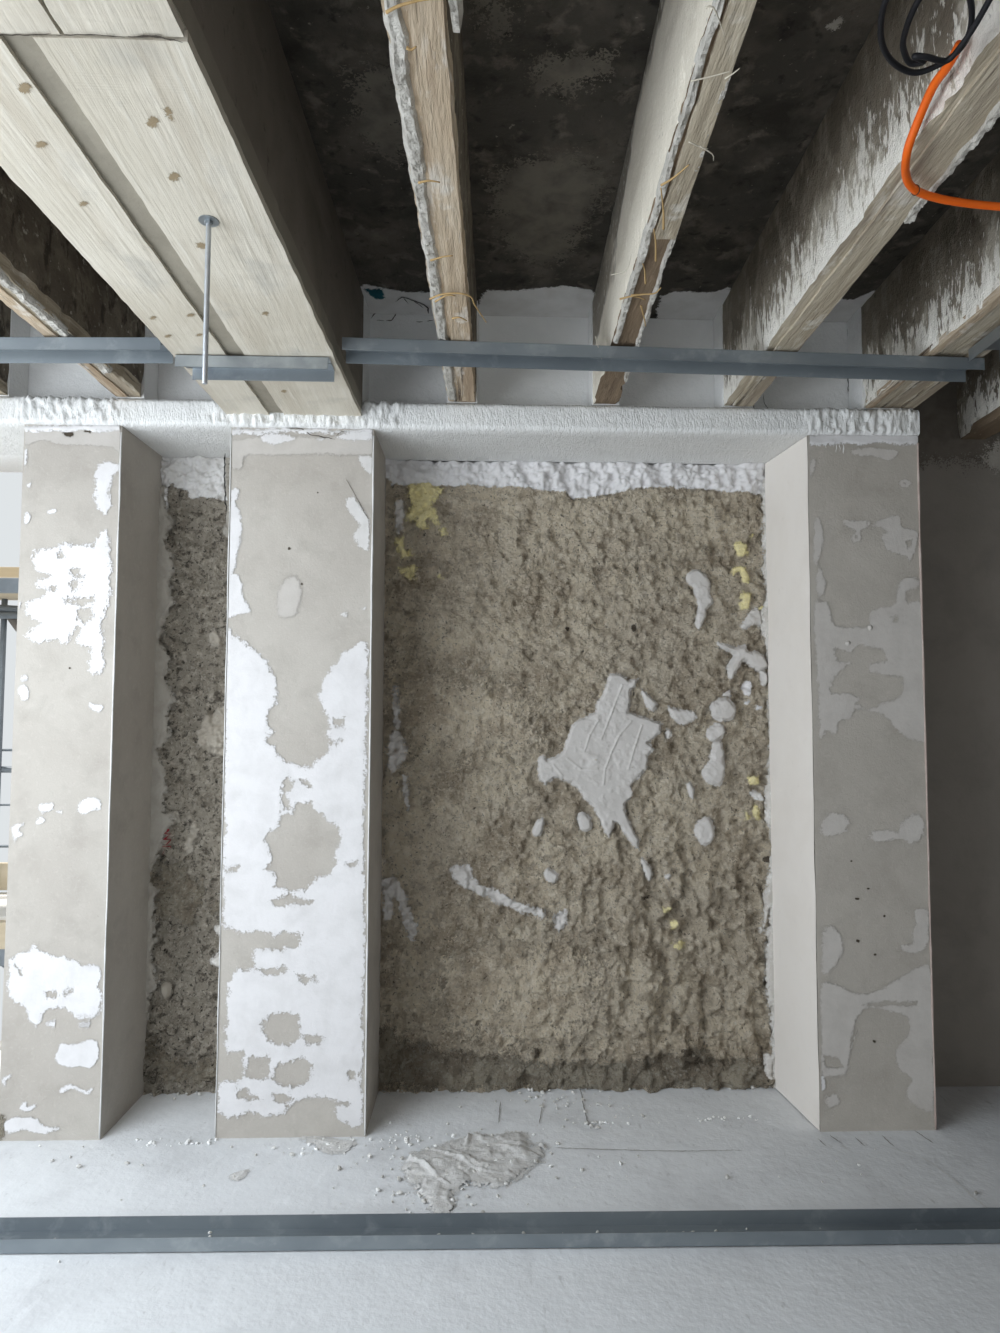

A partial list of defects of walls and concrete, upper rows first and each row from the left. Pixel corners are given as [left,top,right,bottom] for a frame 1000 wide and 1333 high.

flaking render [11,802,62,843]
peeling [819,925,859,976]
flaking render [59,1083,93,1095]